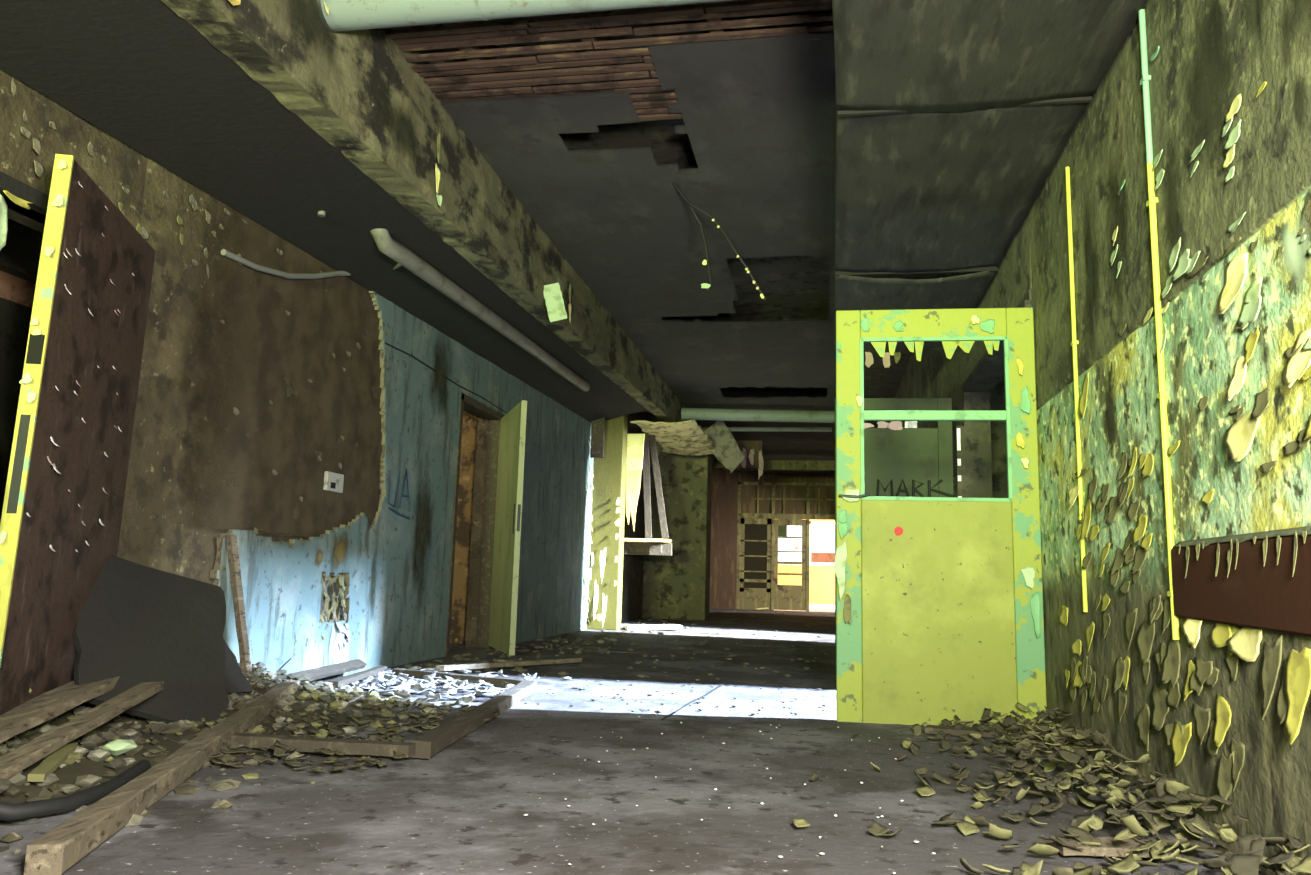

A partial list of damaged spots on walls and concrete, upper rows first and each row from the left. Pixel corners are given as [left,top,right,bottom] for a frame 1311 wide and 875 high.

peeling [1152,149,1165,191]
peeling [1189,140,1205,178]
peeling [1221,81,1267,182]
peeling [1109,226,1122,278]
spalling [1297,199,1311,255]
peeling [972,315,995,333]
peeling [1118,212,1270,462]
peeling [1283,329,1311,387]
peeling [1078,372,1089,419]
peeling [1260,414,1311,473]
flaking render [177,194,620,773]